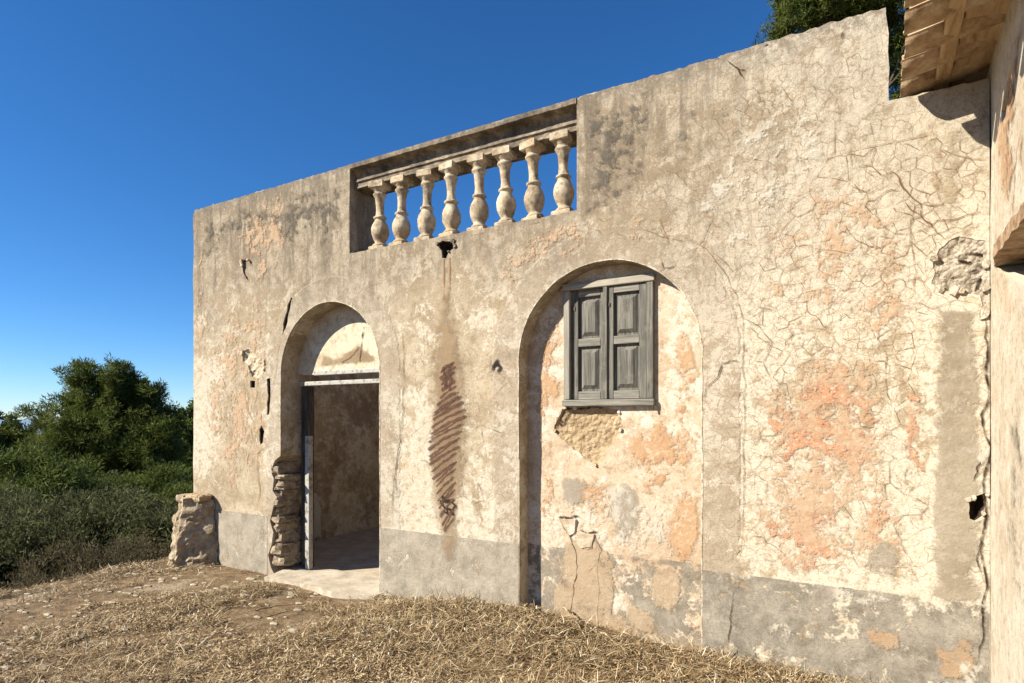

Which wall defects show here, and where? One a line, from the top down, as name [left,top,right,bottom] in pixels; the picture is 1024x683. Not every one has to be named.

damp [198,188,339,279]
crack [501,32,995,568]
spalling [929,237,991,320]
damp [211,300,266,487]
spalling [240,349,266,380]
spalling [553,406,623,467]
crack [559,515,602,614]
damp [866,629,900,650]
damp [936,638,982,683]